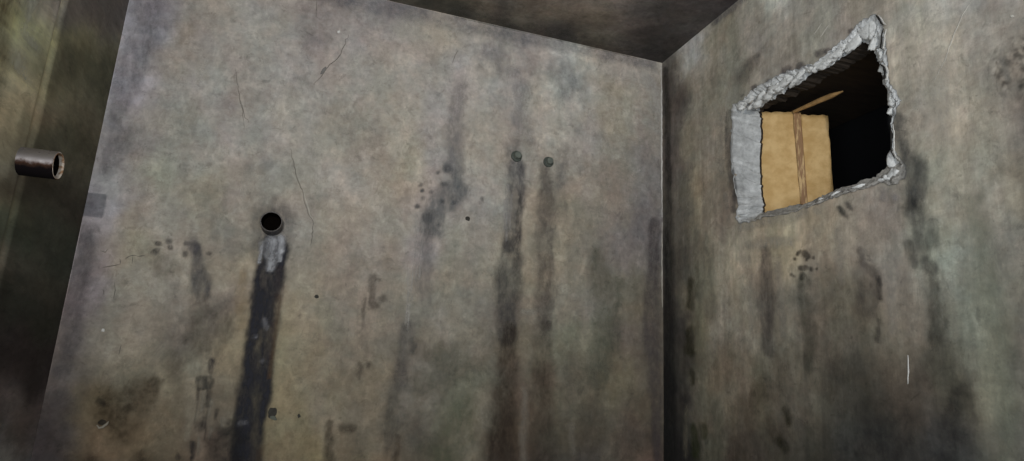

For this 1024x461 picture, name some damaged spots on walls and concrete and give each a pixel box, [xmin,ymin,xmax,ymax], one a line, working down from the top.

spalling [730,14,907,224]
damp [893,116,924,218]
damp [230,235,288,461]